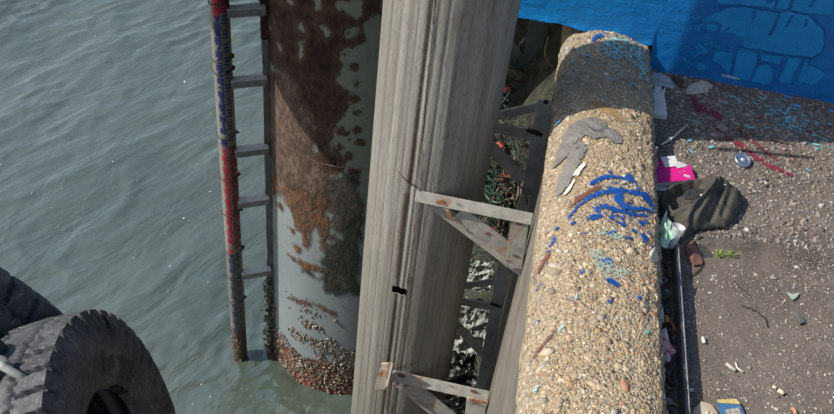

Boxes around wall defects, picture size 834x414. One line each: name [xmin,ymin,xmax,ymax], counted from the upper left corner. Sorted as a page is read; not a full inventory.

peeling [695,0,834,85]
crack [721,0,826,76]
corrosion [268,0,382,273]
corrosion [291,297,336,316]
corrosion [274,337,354,394]